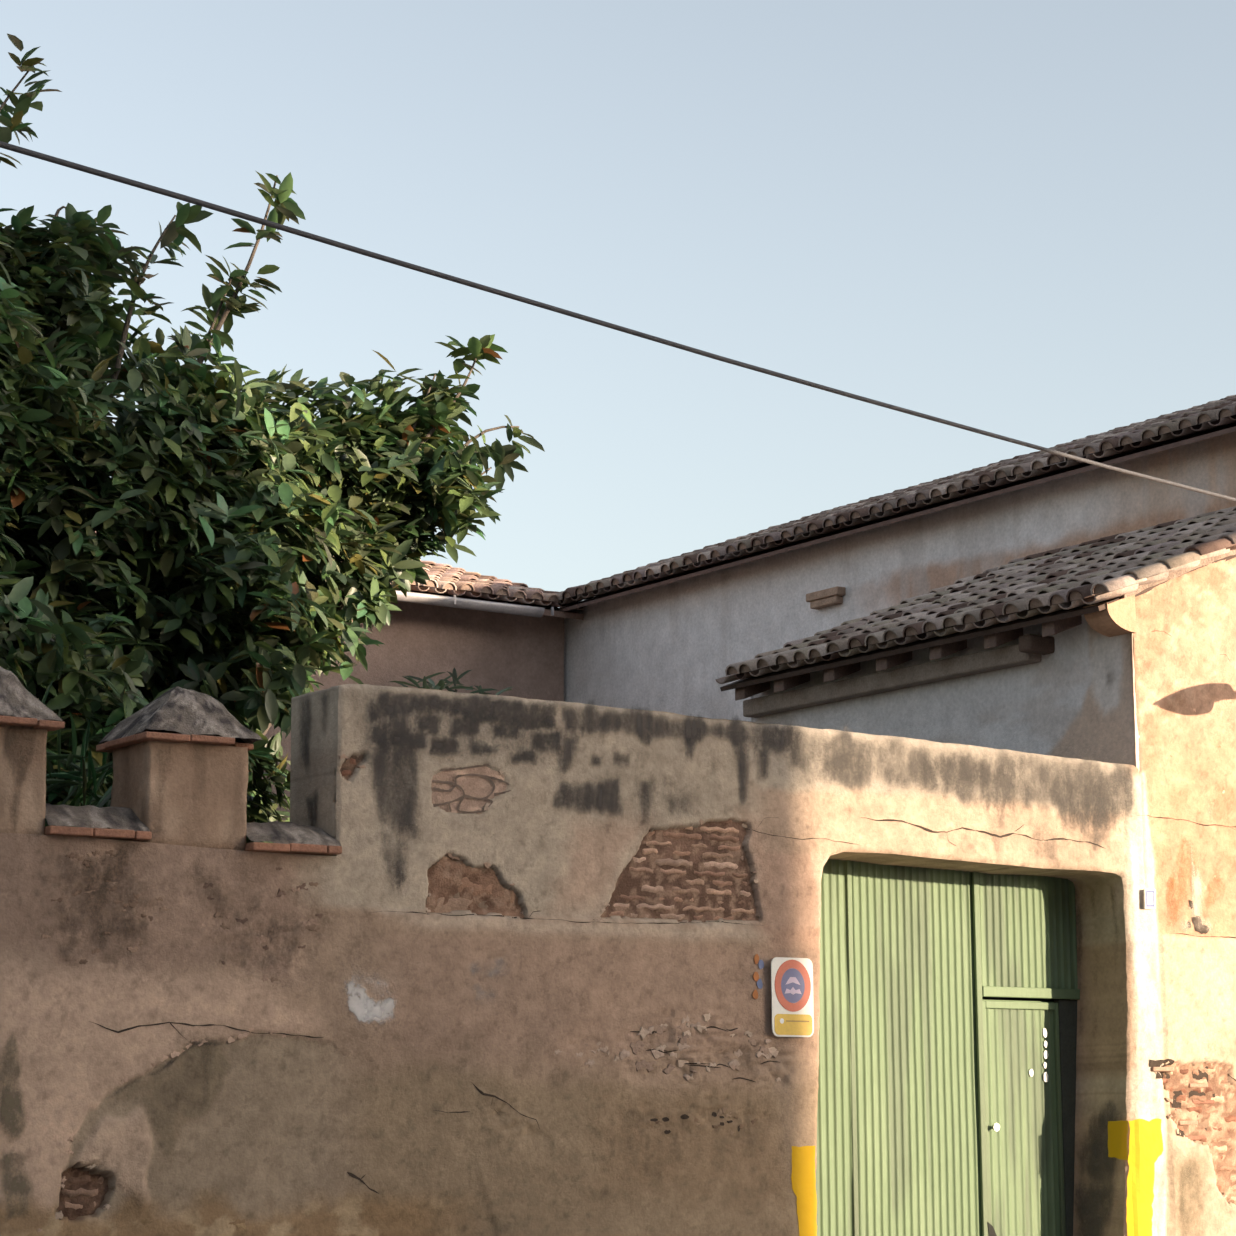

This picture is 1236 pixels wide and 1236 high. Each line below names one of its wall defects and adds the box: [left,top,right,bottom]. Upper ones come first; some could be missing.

spalling [339,754,366,780]
spalling [431,763,511,814]
spalling [425,853,525,919]
water stain [371,692,806,833]
spalling [593,819,760,923]
crack [748,817,1106,849]
water stain [824,730,1133,840]
crack [1137,815,1236,829]
crack [89,1021,323,1040]
spalling [55,1137,111,1220]
water stain [1076,1109,1116,1236]
spalling [1149,1057,1236,1207]